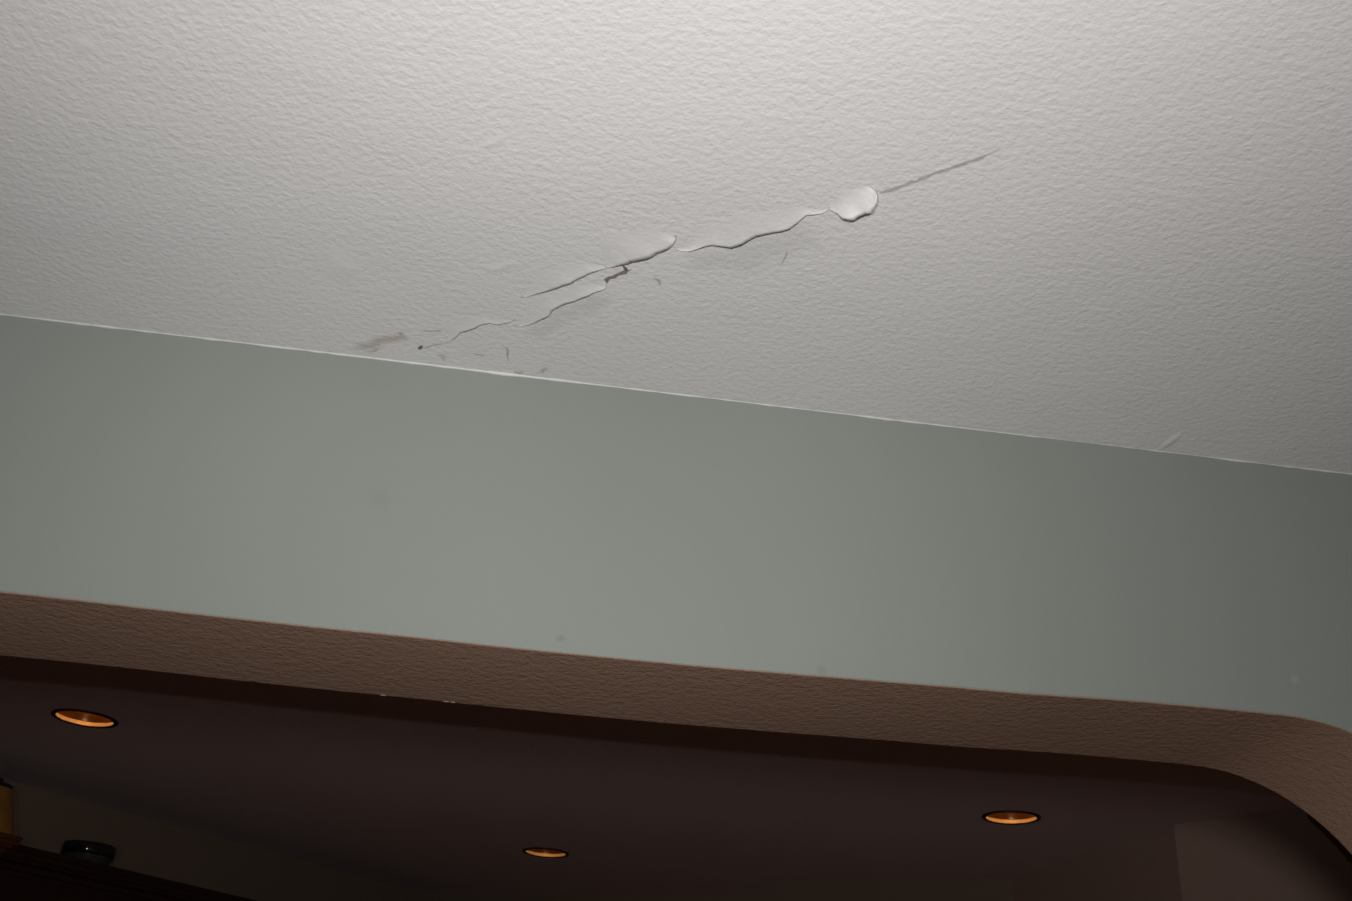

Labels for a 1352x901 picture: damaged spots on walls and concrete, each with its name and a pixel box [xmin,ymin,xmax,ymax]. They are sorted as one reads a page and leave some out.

peeling [446,186,877,343]